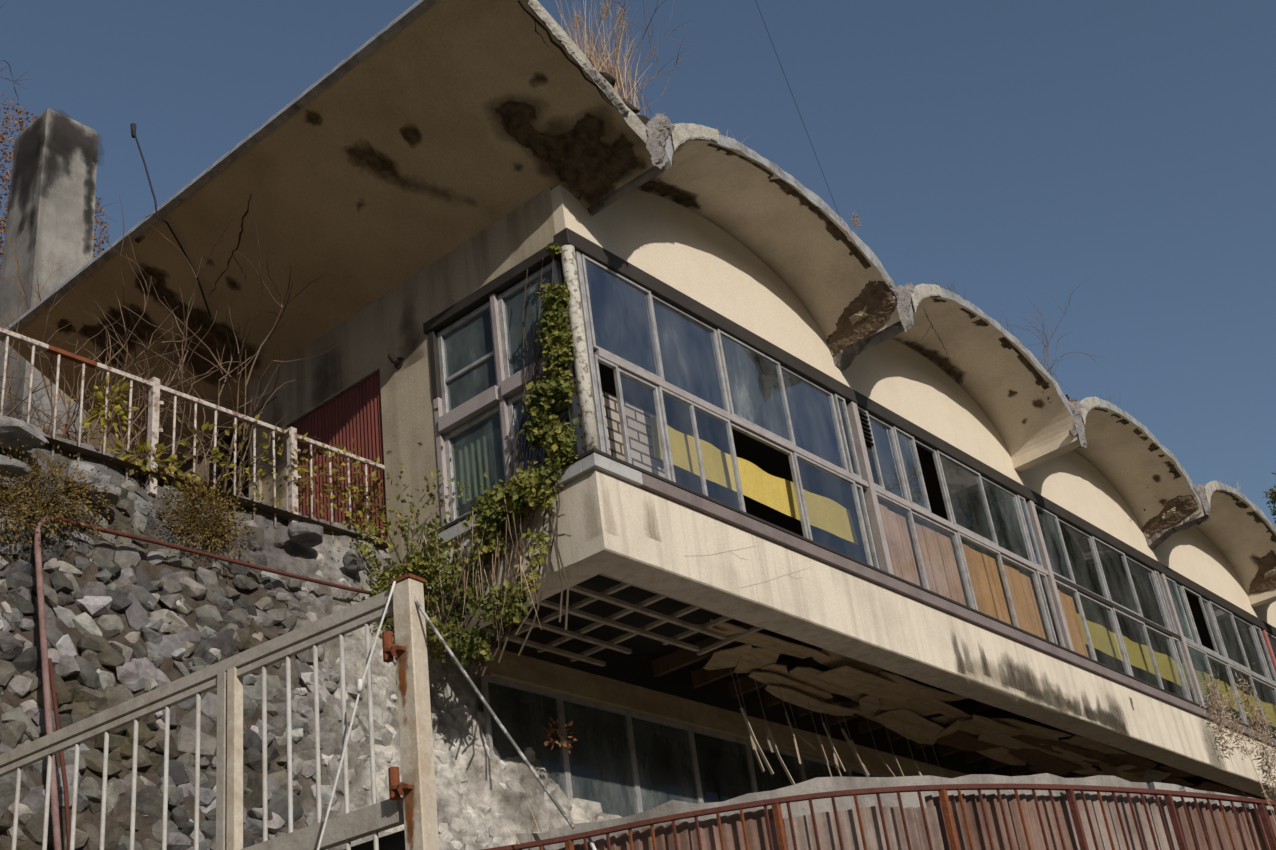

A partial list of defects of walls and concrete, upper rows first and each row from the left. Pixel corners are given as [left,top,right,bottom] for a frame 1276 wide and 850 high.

spalling [526,0,629,117]
damp [13,112,101,252]
crack [208,194,251,298]
damp [347,147,406,185]
damp [400,127,421,145]
peeling [494,101,947,354]
peeling [960,308,989,327]
peeling [999,337,1050,390]
spalling [1067,396,1181,480]
spalling [1142,480,1276,594]
rust [397,650,407,721]
damp [953,640,1134,734]